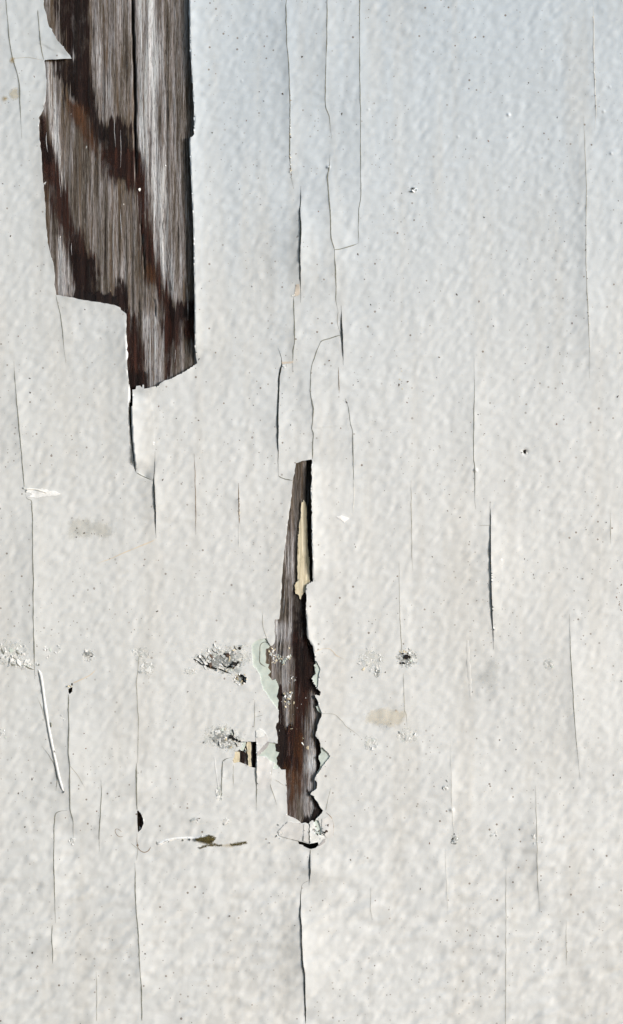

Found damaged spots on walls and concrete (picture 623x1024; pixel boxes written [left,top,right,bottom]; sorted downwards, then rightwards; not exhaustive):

peeling [39,0,197,479]
crack [277,0,361,510]
peeling [184,460,334,846]
crack [473,380,494,648]
crack [299,793,334,1024]